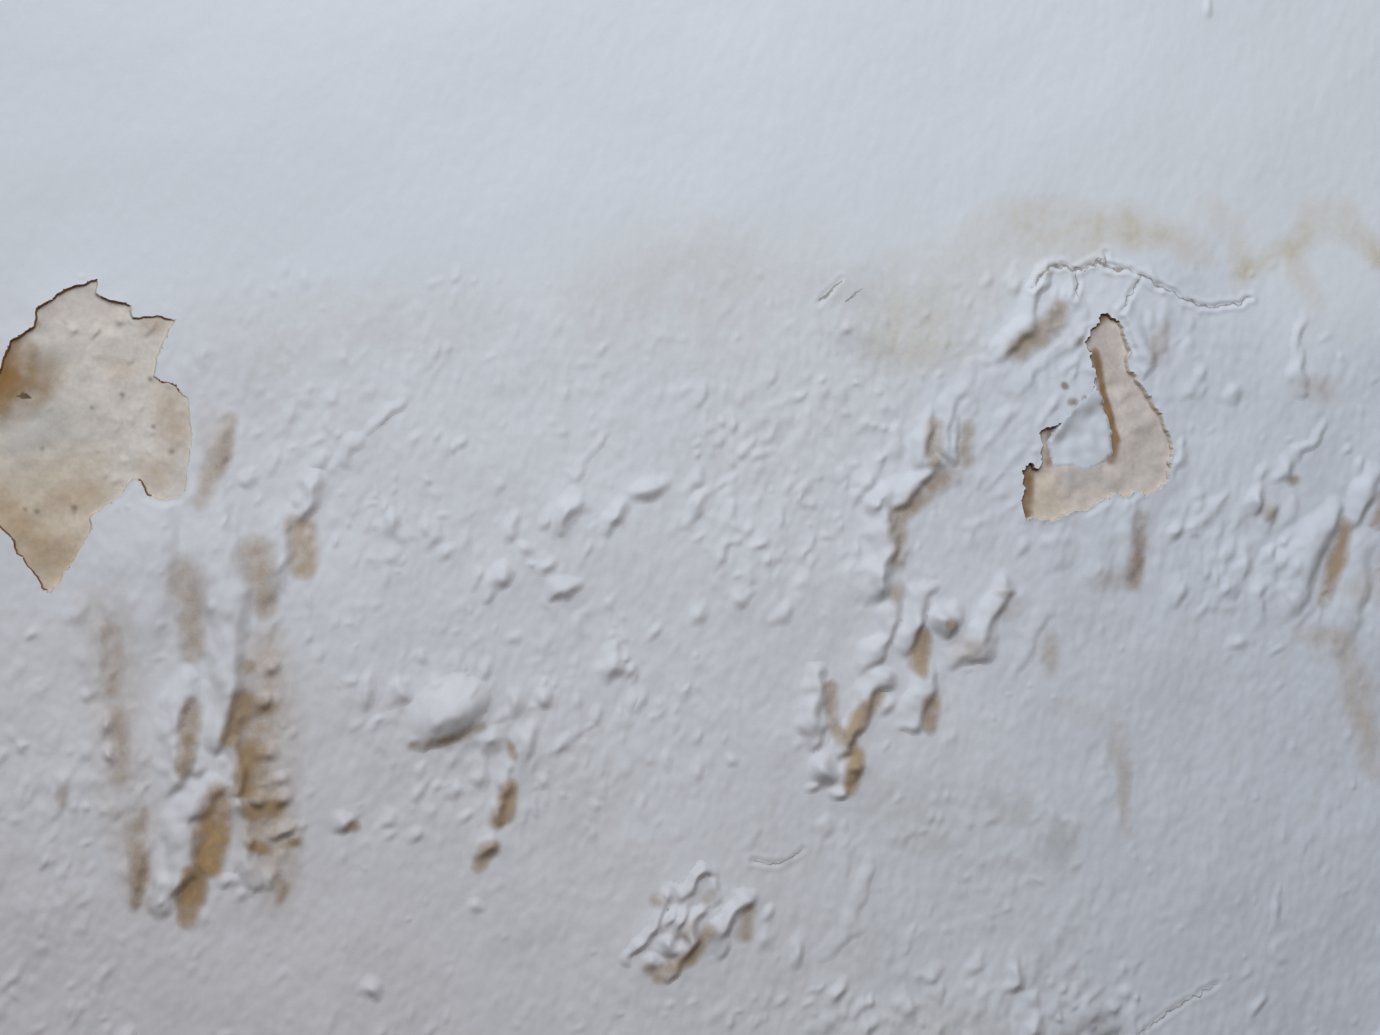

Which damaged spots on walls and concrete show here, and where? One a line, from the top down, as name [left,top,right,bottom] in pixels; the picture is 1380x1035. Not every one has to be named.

crack [1031,254,1248,310]
peeling [0,279,193,594]
peeling [1021,313,1174,522]